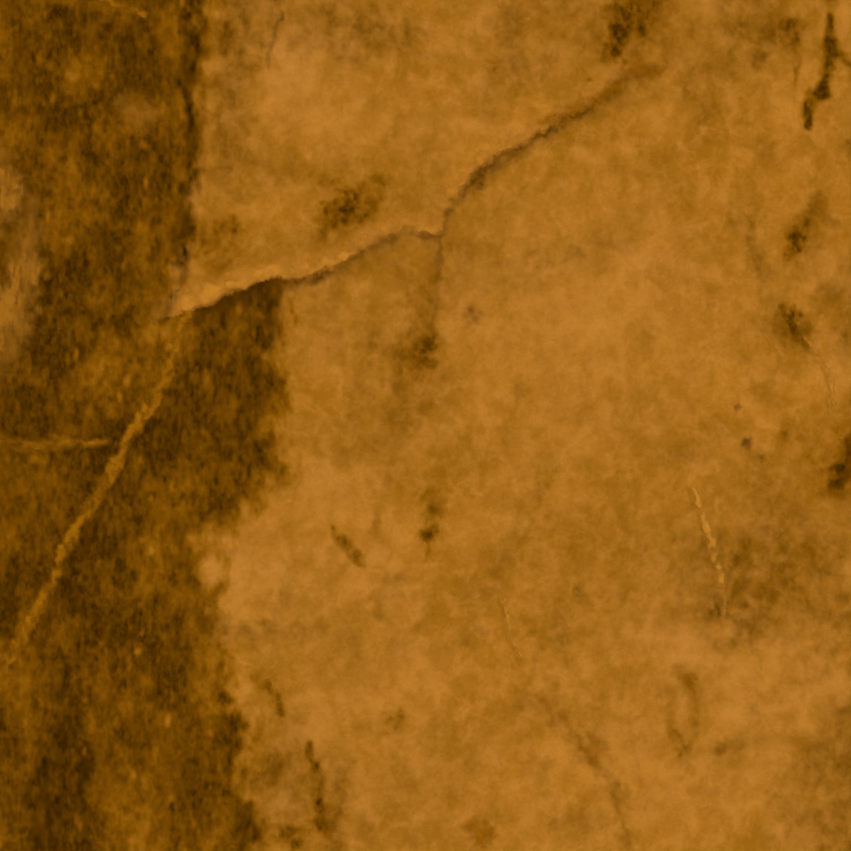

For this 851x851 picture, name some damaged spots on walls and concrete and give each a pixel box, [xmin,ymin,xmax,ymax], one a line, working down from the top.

damp [0,0,284,851]
crack [0,121,556,684]